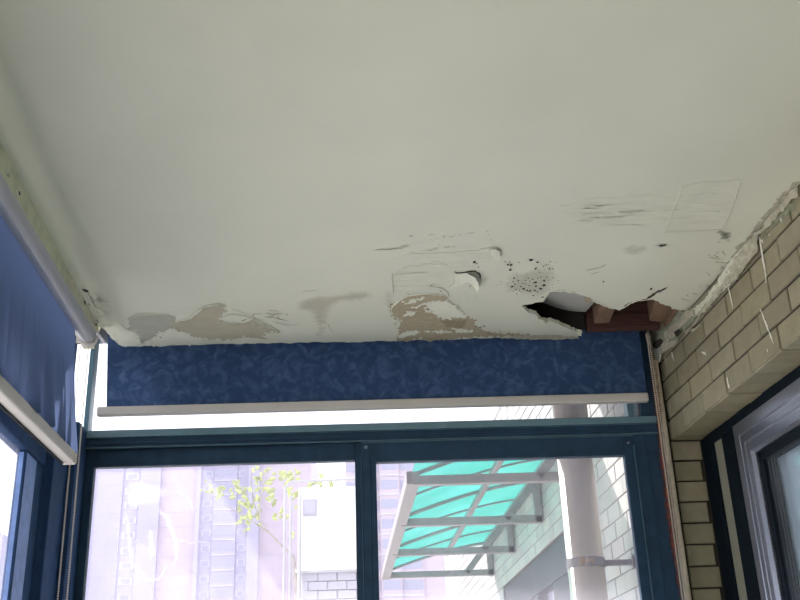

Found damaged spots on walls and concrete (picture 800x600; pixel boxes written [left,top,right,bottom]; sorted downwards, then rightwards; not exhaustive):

peeling [67,277,299,347]
peeling [389,261,582,342]
water stain [505,259,559,298]
spalling [645,182,800,363]